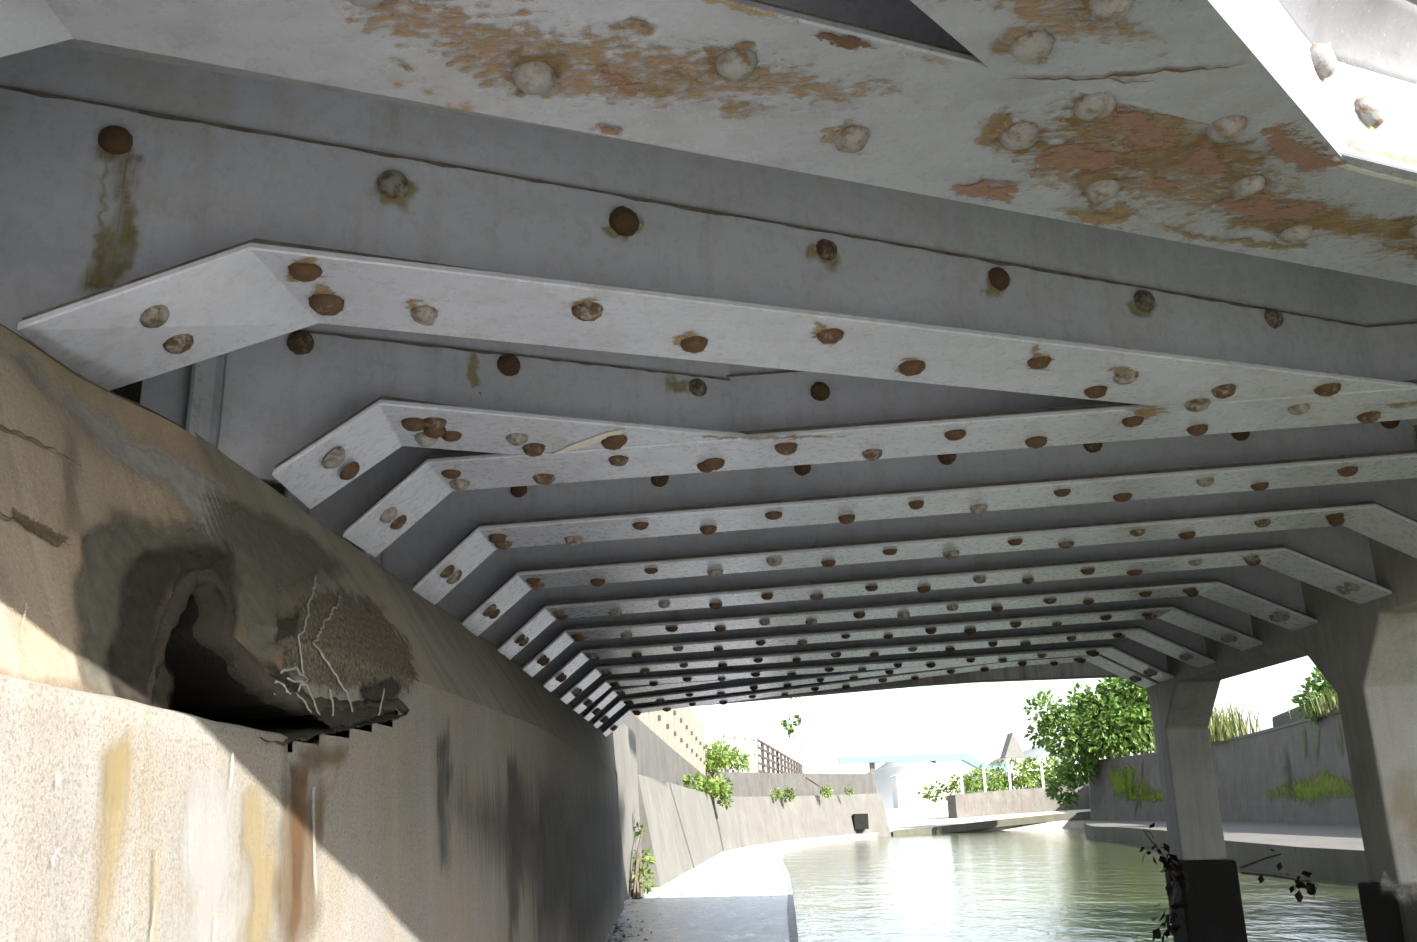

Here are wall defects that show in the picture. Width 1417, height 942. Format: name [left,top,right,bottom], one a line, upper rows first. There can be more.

corrosion [345,0,903,144]
corrosion [975,0,1174,64]
corrosion [974,93,1417,270]
crack [0,424,82,466]
spalling [148,567,418,745]
leakage [437,732,625,942]